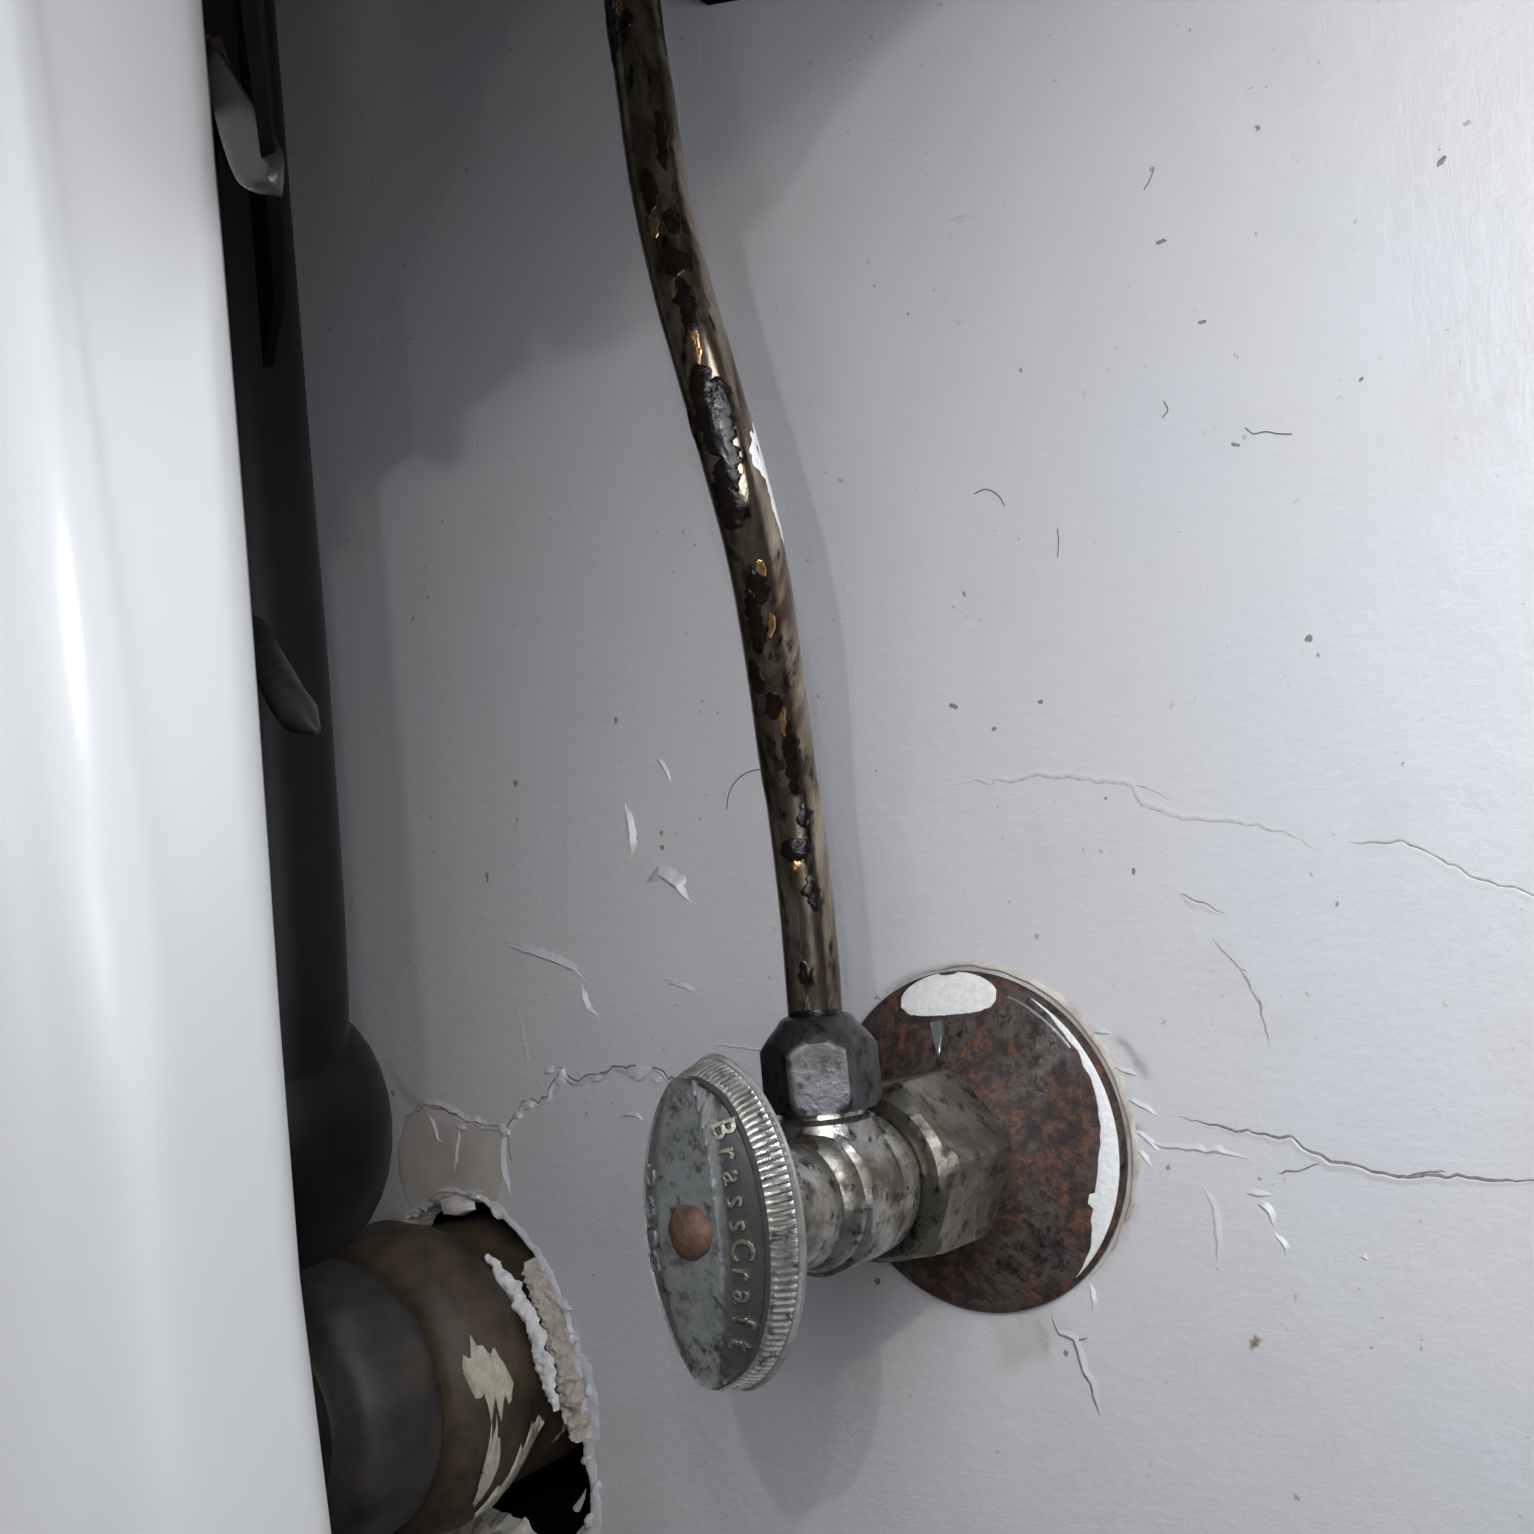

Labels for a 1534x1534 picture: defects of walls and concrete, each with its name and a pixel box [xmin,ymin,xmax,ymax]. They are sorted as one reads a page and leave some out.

rust [604,0,635,67]
rust [639,110,699,334]
rust [687,363,748,531]
rust [744,570,822,912]
crack [950,767,1534,903]
rust [788,1009,839,1018]
crack [1179,893,1270,1046]
crack [449,1064,676,1162]
crack [1138,1116,1534,1266]
spalling [398,1099,602,1534]
crack [1051,1316,1102,1416]